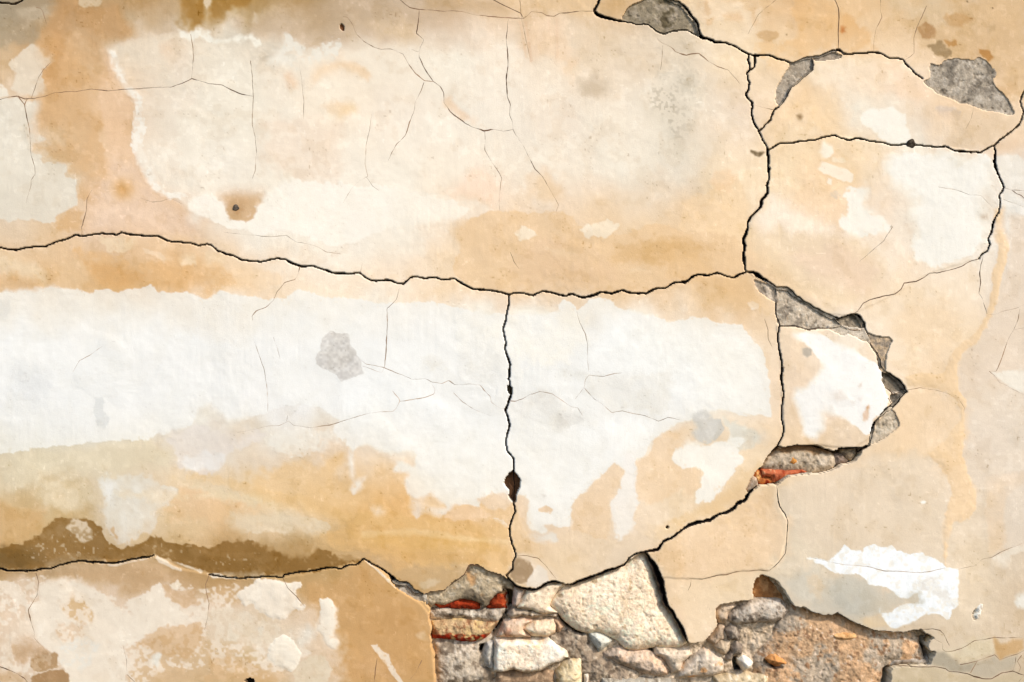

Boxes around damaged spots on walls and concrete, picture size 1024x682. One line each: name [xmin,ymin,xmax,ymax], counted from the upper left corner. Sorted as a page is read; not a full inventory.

spalling [622,0,700,37]
spalling [775,51,846,108]
spalling [924,58,1014,115]
crack [915,91,1024,315]
crack [0,0,928,590]
peeling [746,280,906,492]
crack [838,343,945,452]
leakage [0,469,526,594]
crack [247,559,448,602]
spalling [365,554,550,682]
crack [490,485,757,643]
spalling [527,544,960,682]